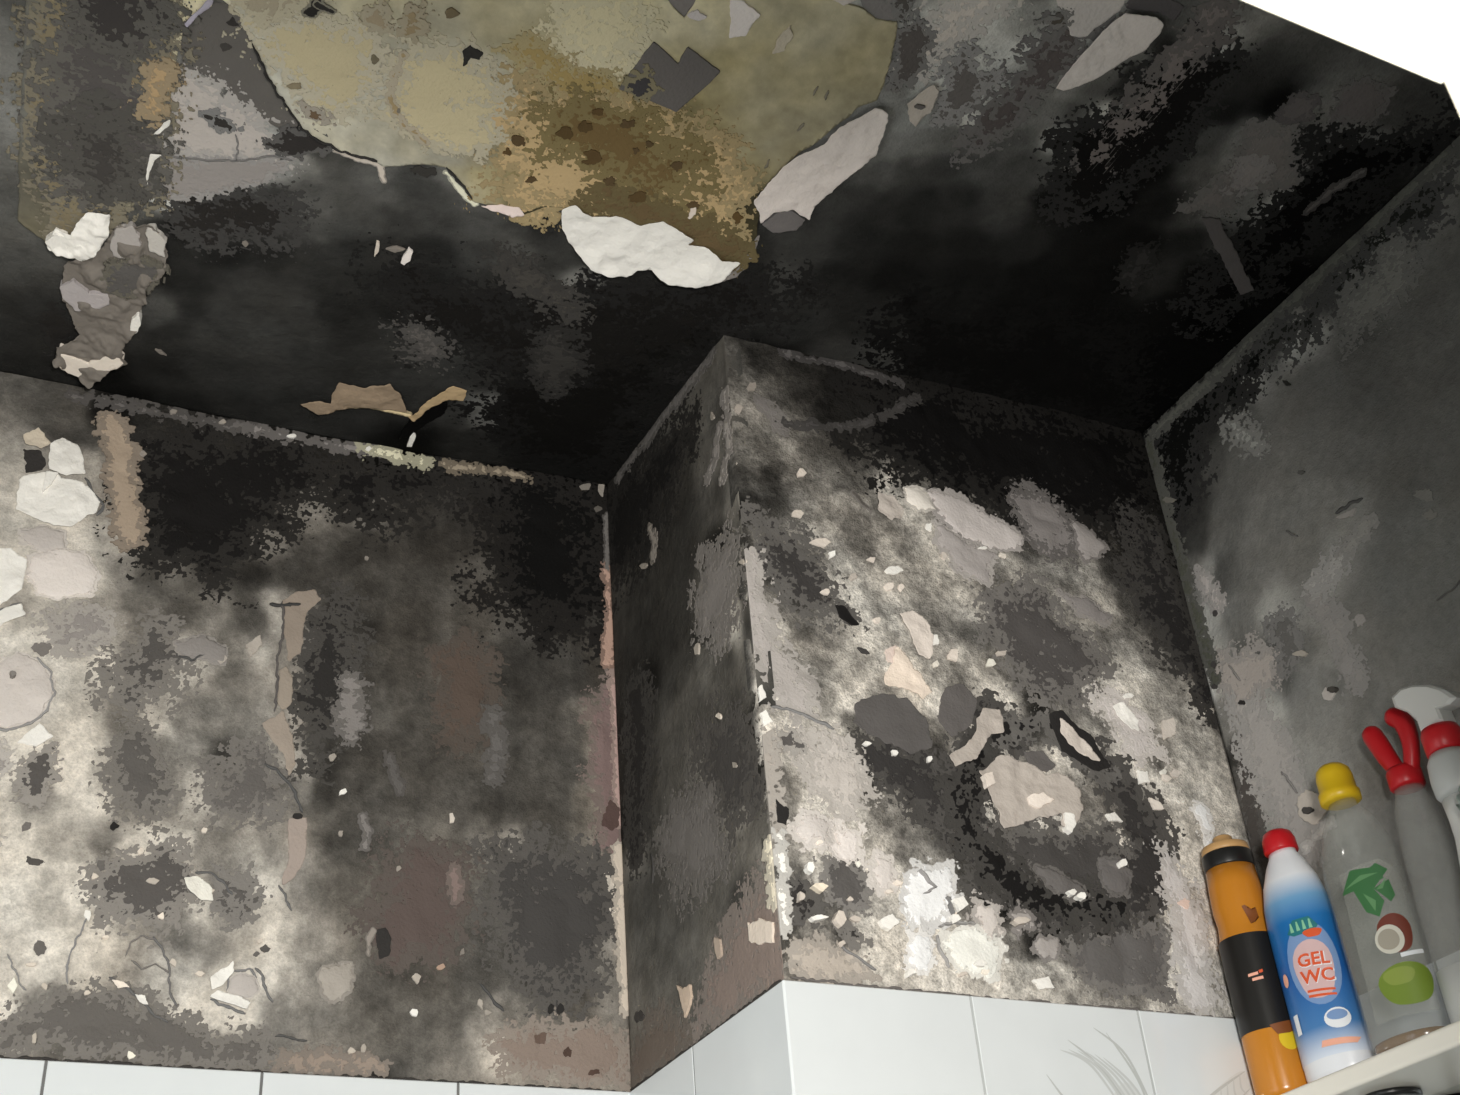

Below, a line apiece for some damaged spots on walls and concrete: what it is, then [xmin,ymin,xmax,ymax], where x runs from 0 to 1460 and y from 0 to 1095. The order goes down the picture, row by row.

peeling [18,35,168,389]
leakage [0,0,670,246]
peeling [172,0,913,288]
peeling [1056,0,1184,91]
peeling [16,409,150,553]
peeling [301,383,467,447]
leakage [62,257,775,648]
leakage [753,74,1460,876]
leakage [23,598,324,950]
leakage [686,503,1230,1017]
peeling [853,610,1110,835]
leakage [0,972,292,1071]